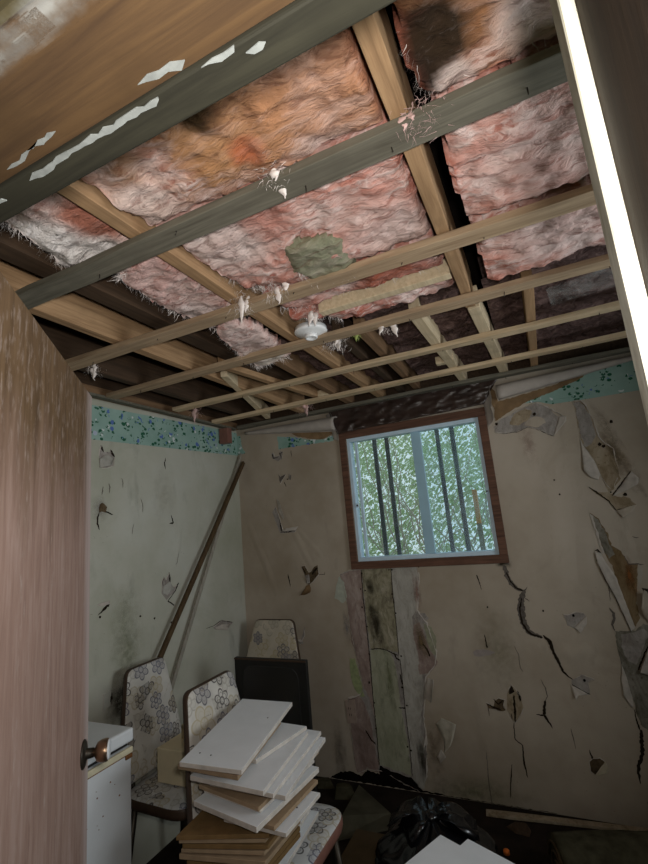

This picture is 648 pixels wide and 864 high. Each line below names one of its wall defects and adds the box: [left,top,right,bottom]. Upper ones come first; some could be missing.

peeling [138,60,185,85]
peeling [201,45,234,68]
peeling [246,41,266,54]
peeling [7,131,56,170]
peeling [29,97,159,181]
crack [503,565,573,680]
peeling [335,567,456,790]
crack [536,680,576,749]
crack [486,726,528,803]
crack [637,730,645,784]